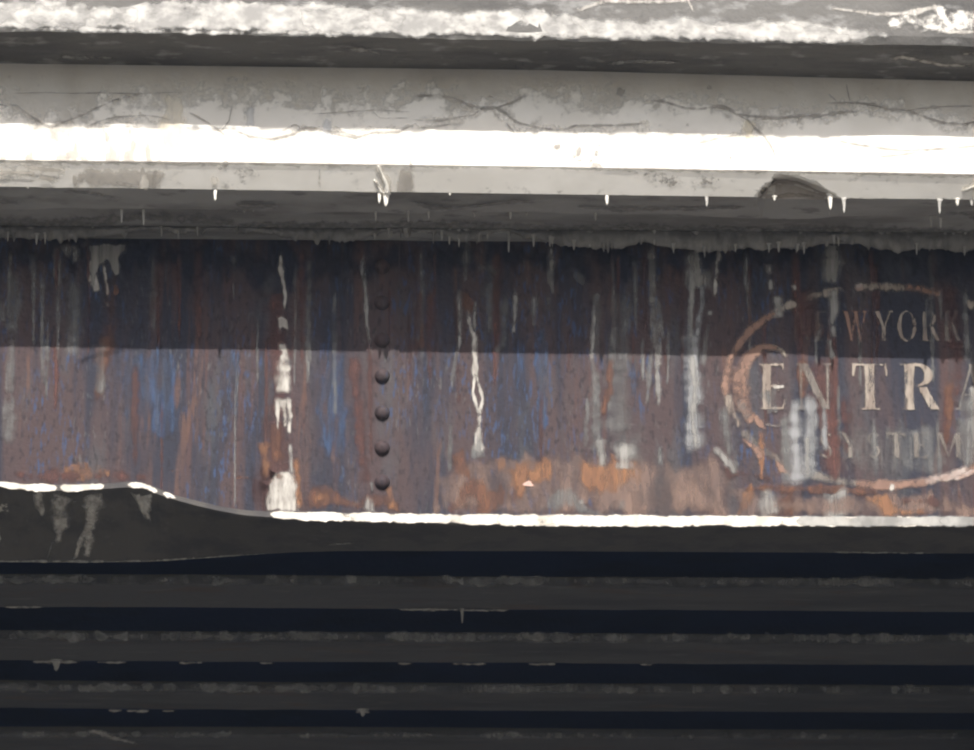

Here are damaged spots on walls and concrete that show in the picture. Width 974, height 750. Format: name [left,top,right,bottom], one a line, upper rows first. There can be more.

crack [32,159,426,167]
crack [193,108,408,139]
crack [419,94,643,130]
crack [605,90,974,176]
leakage [0,77,974,481]
leakage [0,482,104,492]
corrosion [18,464,144,483]
leakage [128,406,175,498]
corrosion [260,294,398,511]
corrosion [435,435,802,516]
leakage [267,445,974,527]
corrosion [797,362,974,517]